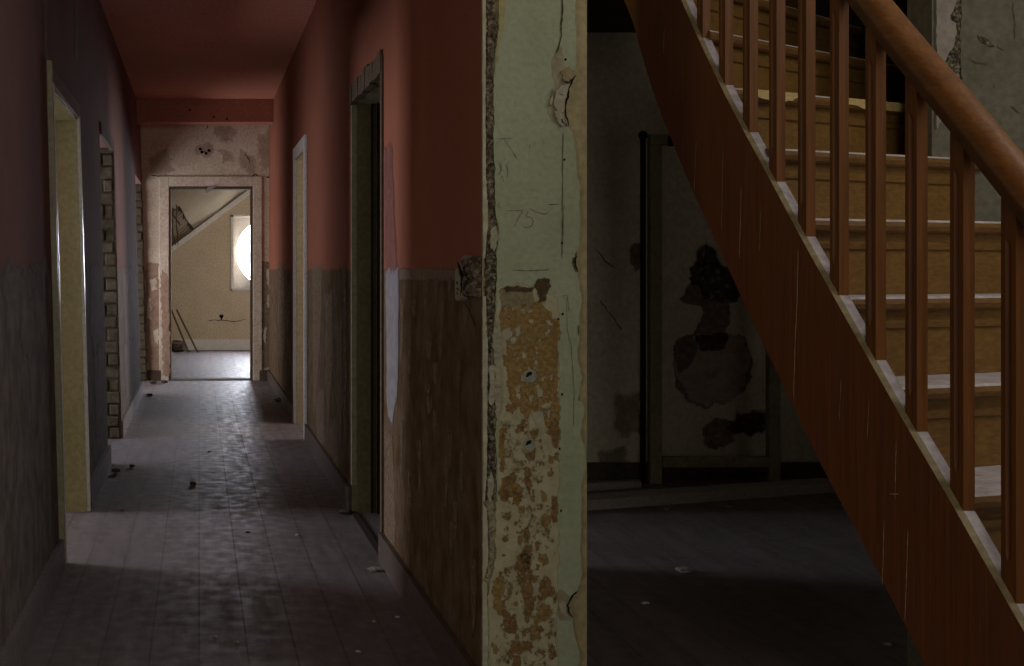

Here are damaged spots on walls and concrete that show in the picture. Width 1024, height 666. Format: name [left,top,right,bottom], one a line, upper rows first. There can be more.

flaking render [934,0,996,80]
flaking render [135,184,171,381]
flaking render [455,0,586,666]